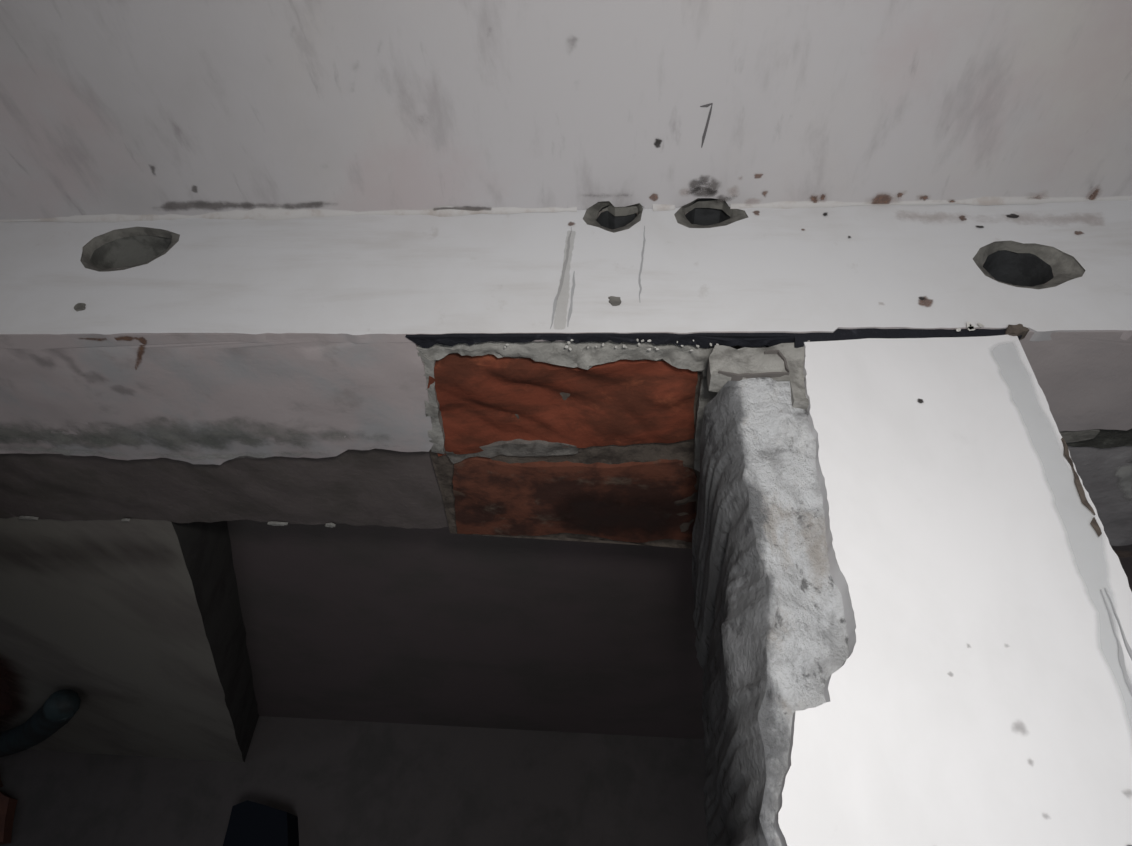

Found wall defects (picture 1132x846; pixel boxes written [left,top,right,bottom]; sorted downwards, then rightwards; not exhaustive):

rust [873,193,903,204]
rust [82,336,147,368]
leakage [0,422,305,459]
spalling [1061,437,1102,537]
spalling [416,340,849,846]